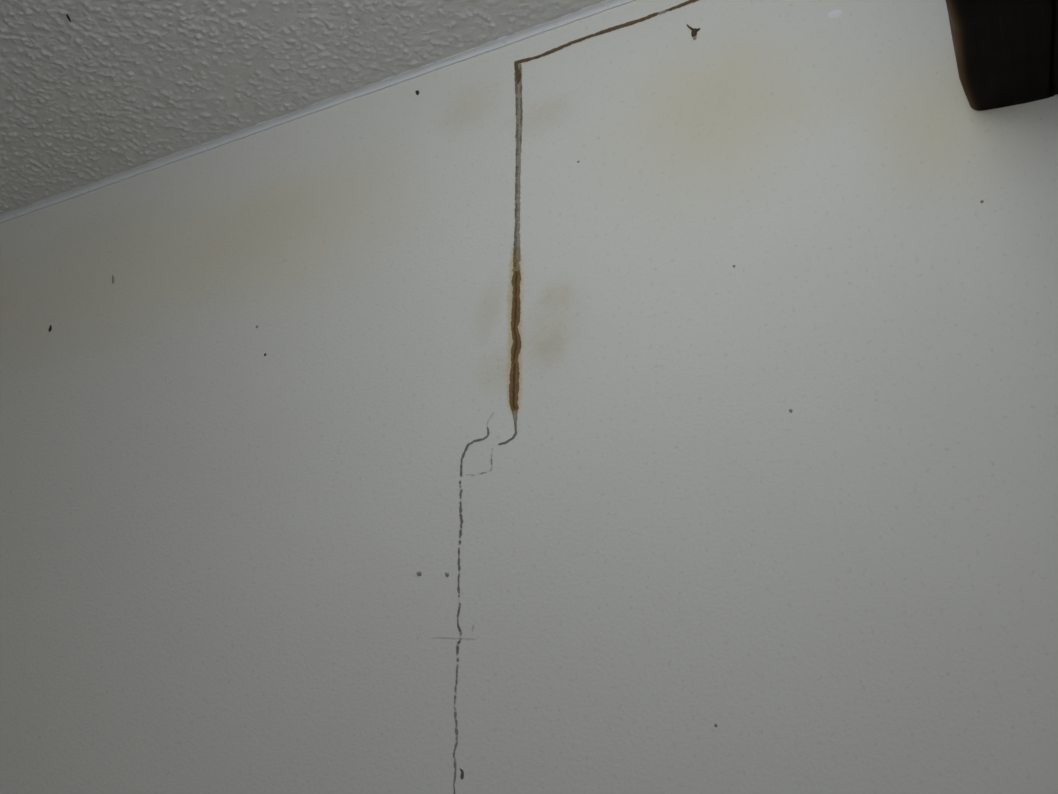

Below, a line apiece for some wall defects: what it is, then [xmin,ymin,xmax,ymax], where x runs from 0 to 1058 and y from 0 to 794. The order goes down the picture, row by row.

crack [512,0,698,272]
rust [509,271,521,411]
crack [453,410,518,794]